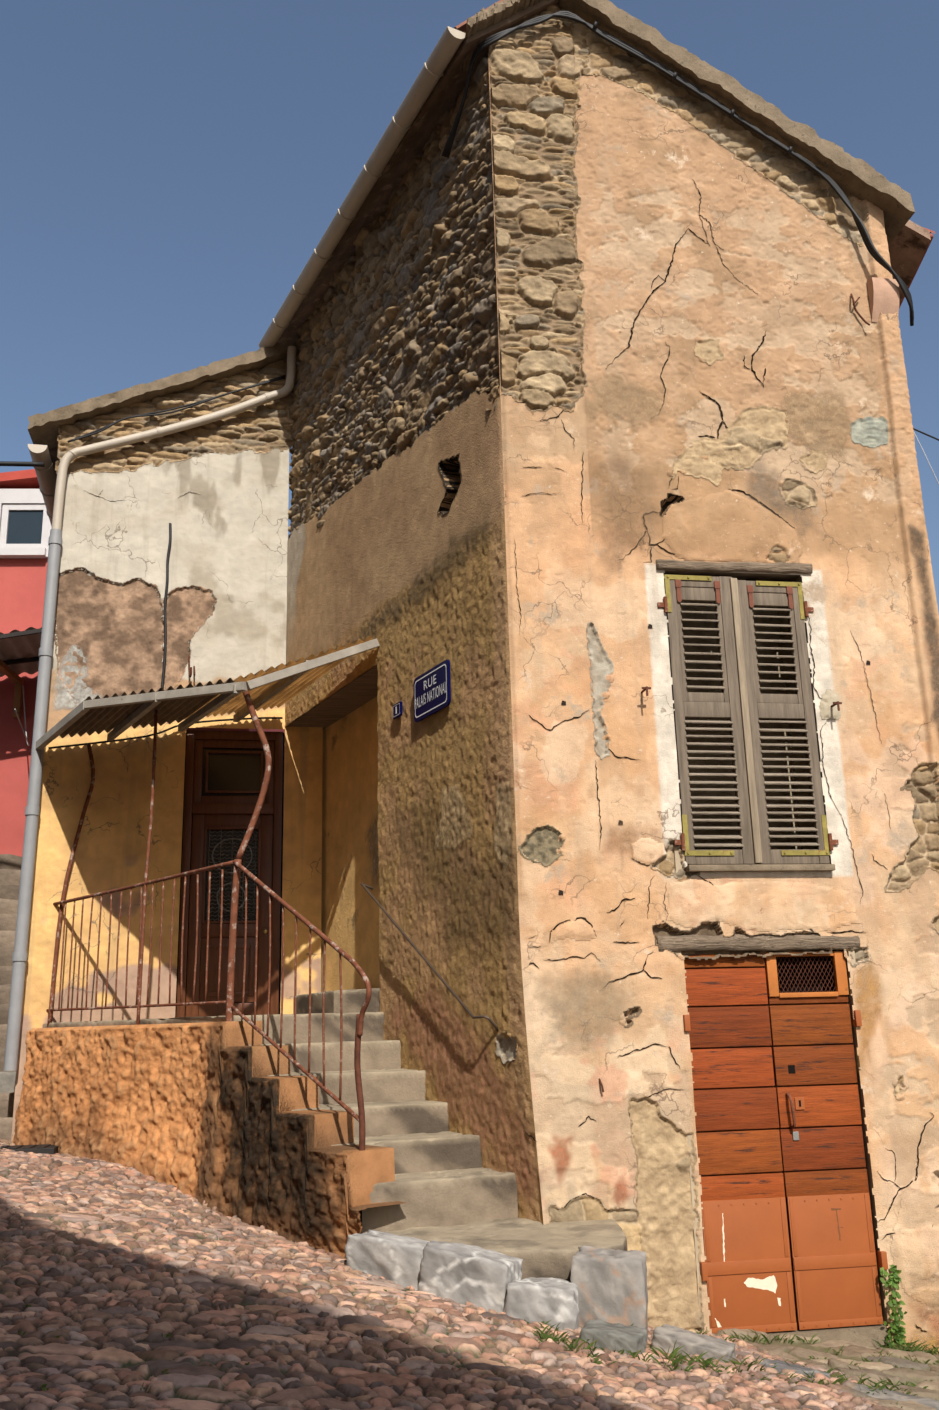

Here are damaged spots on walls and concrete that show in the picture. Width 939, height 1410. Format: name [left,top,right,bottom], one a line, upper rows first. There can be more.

crack [606,179,757,369]
crack [652,344,728,438]
crack [743,332,766,387]
peeling [660,405,828,516]
peeling [54,567,217,707]
peeling [586,622,614,759]
peeling [518,825,566,867]
peeling [885,761,939,892]
peeling [930,915,939,934]
crack [874,1113,934,1236]